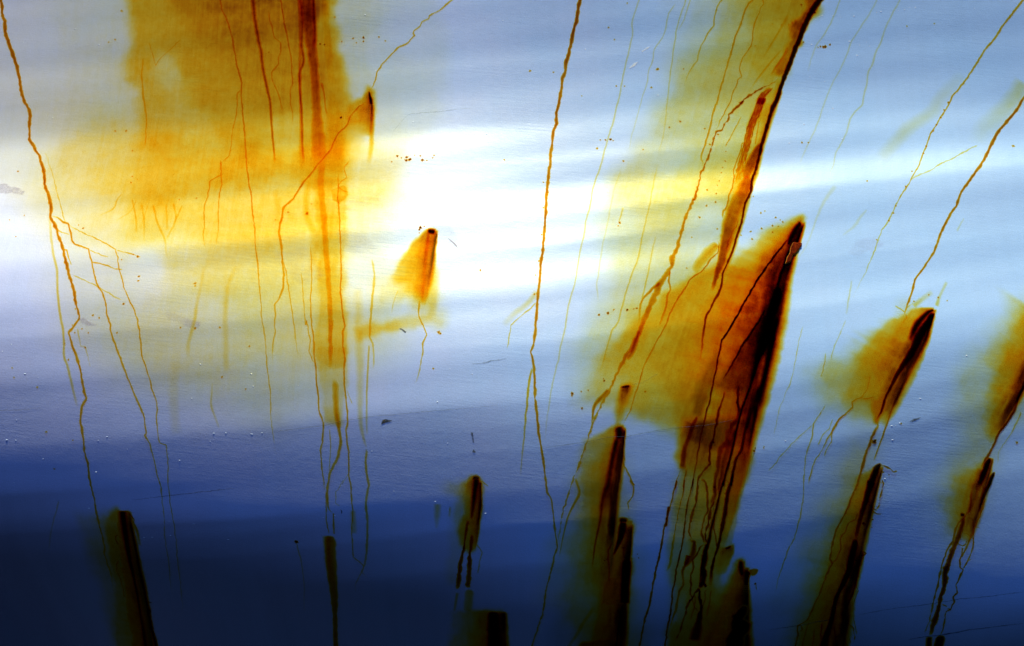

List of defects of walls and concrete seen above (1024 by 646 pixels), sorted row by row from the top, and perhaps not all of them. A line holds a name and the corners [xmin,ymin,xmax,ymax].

rust [155,0,344,170]
rust [363,92,374,124]
rust [419,226,437,293]
rust [598,0,823,646]
rust [111,511,157,646]
rust [457,475,482,587]
rust [581,378,639,646]
rust [795,294,948,646]
rust [927,344,1024,646]